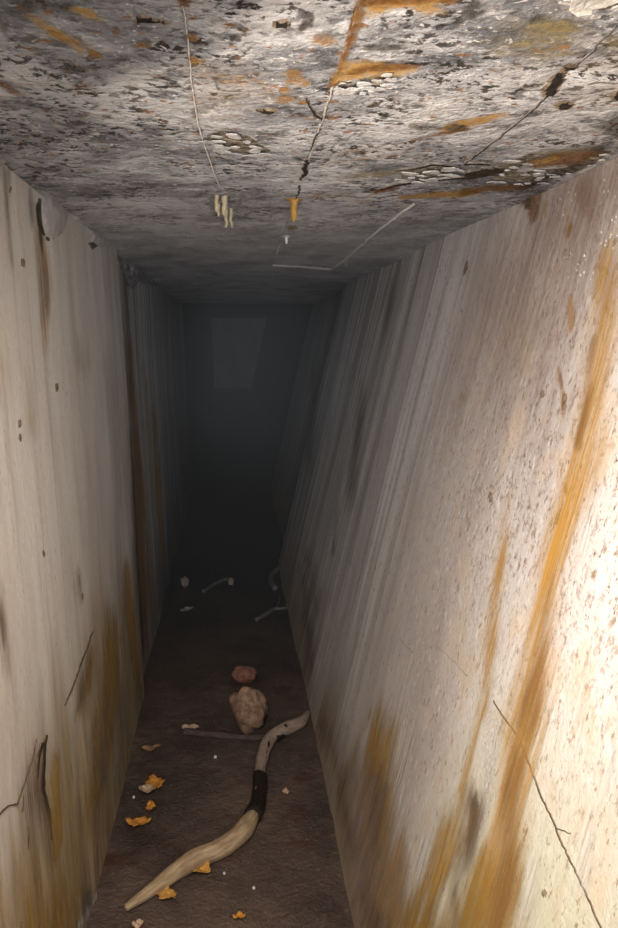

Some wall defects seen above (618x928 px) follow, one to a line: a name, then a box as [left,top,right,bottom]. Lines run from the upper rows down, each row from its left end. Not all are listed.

rust [313,0,457,88]
peeling [558,0,618,20]
spalling [198,131,273,157]
crack [295,99,323,199]
spalling [394,166,465,184]
rust [370,168,530,199]
rust [412,114,503,141]
crack [376,97,546,191]
spalling [486,151,611,185]
damp [480,117,618,346]
rust [483,248,614,928]
crack [493,700,602,928]